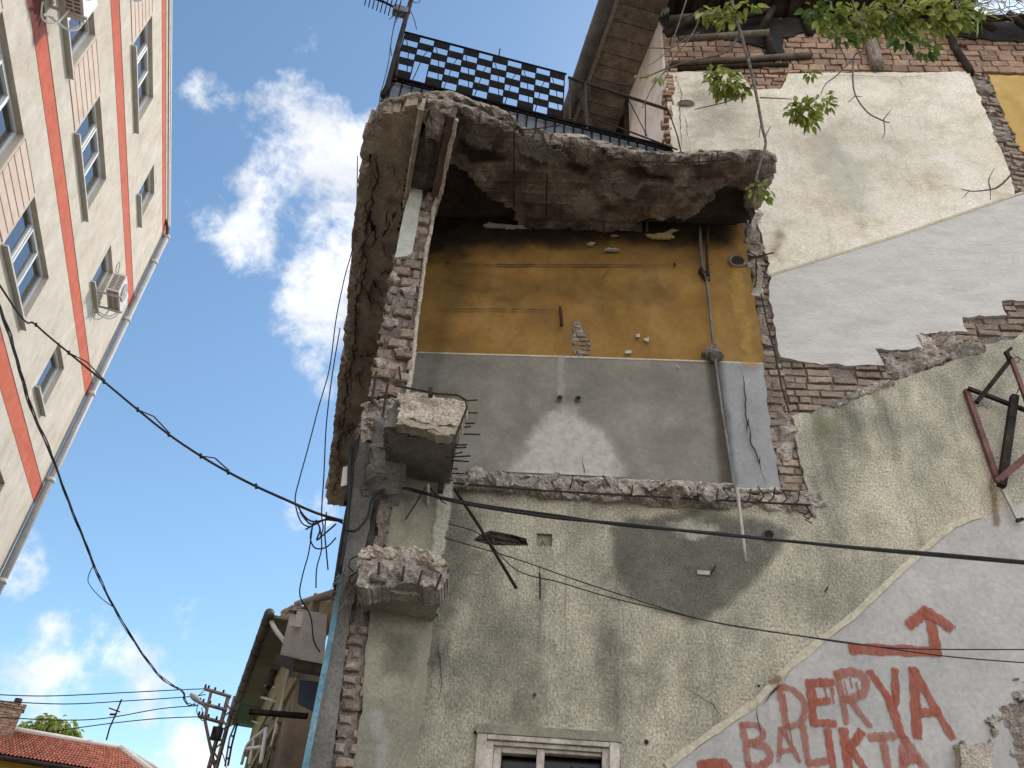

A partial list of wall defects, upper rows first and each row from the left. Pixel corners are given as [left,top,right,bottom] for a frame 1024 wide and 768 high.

peeling [483,222,527,230]
peeling [587,220,620,252]
peeling [645,228,678,240]
crack [333,154,401,496]
flaking render [571,319,591,356]
flaking render [714,209,827,524]
spalling [395,366,699,500]
crack [737,363,766,483]
water stain [615,515,785,619]
spalling [953,678,1024,768]